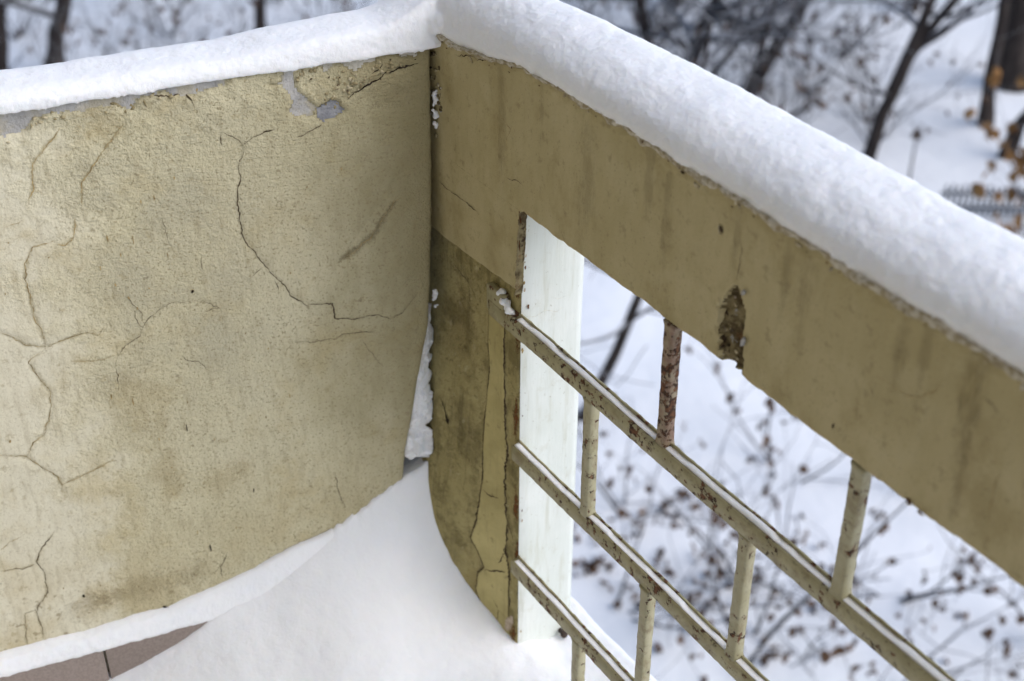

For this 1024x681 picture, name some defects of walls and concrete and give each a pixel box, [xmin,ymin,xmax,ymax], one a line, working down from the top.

peeling [278,52,417,122]
crack [348,63,418,99]
crack [2,533,54,644]
crack [5,219,113,487]
crack [115,300,219,381]
crack [220,129,416,365]
crack [470,324,513,618]
spalling [429,35,1024,390]